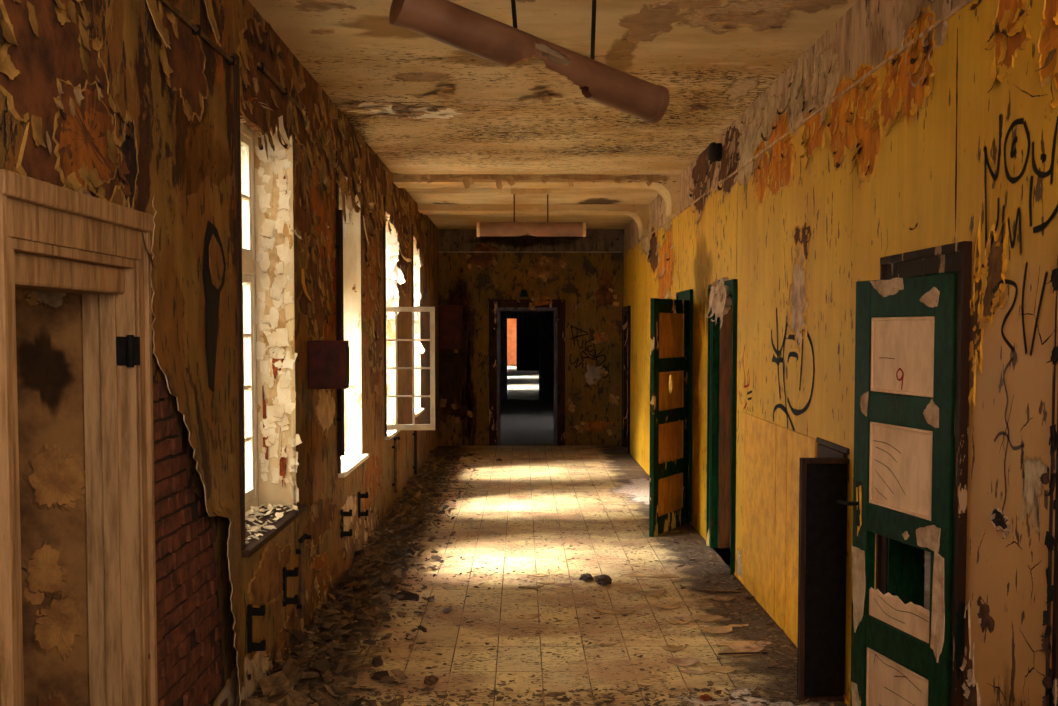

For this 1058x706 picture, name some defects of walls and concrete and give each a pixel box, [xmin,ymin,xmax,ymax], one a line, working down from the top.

peeling [204,0,221,47]
peeling [294,0,357,12]
peeling [618,0,848,43]
peeling [985,0,1058,109]
water stain [425,70,759,157]
peeling [689,0,948,225]
peeling [236,16,469,504]
peeling [139,166,292,706]
spalling [300,453,384,601]
peeling [395,591,419,601]
peeling [371,671,389,680]